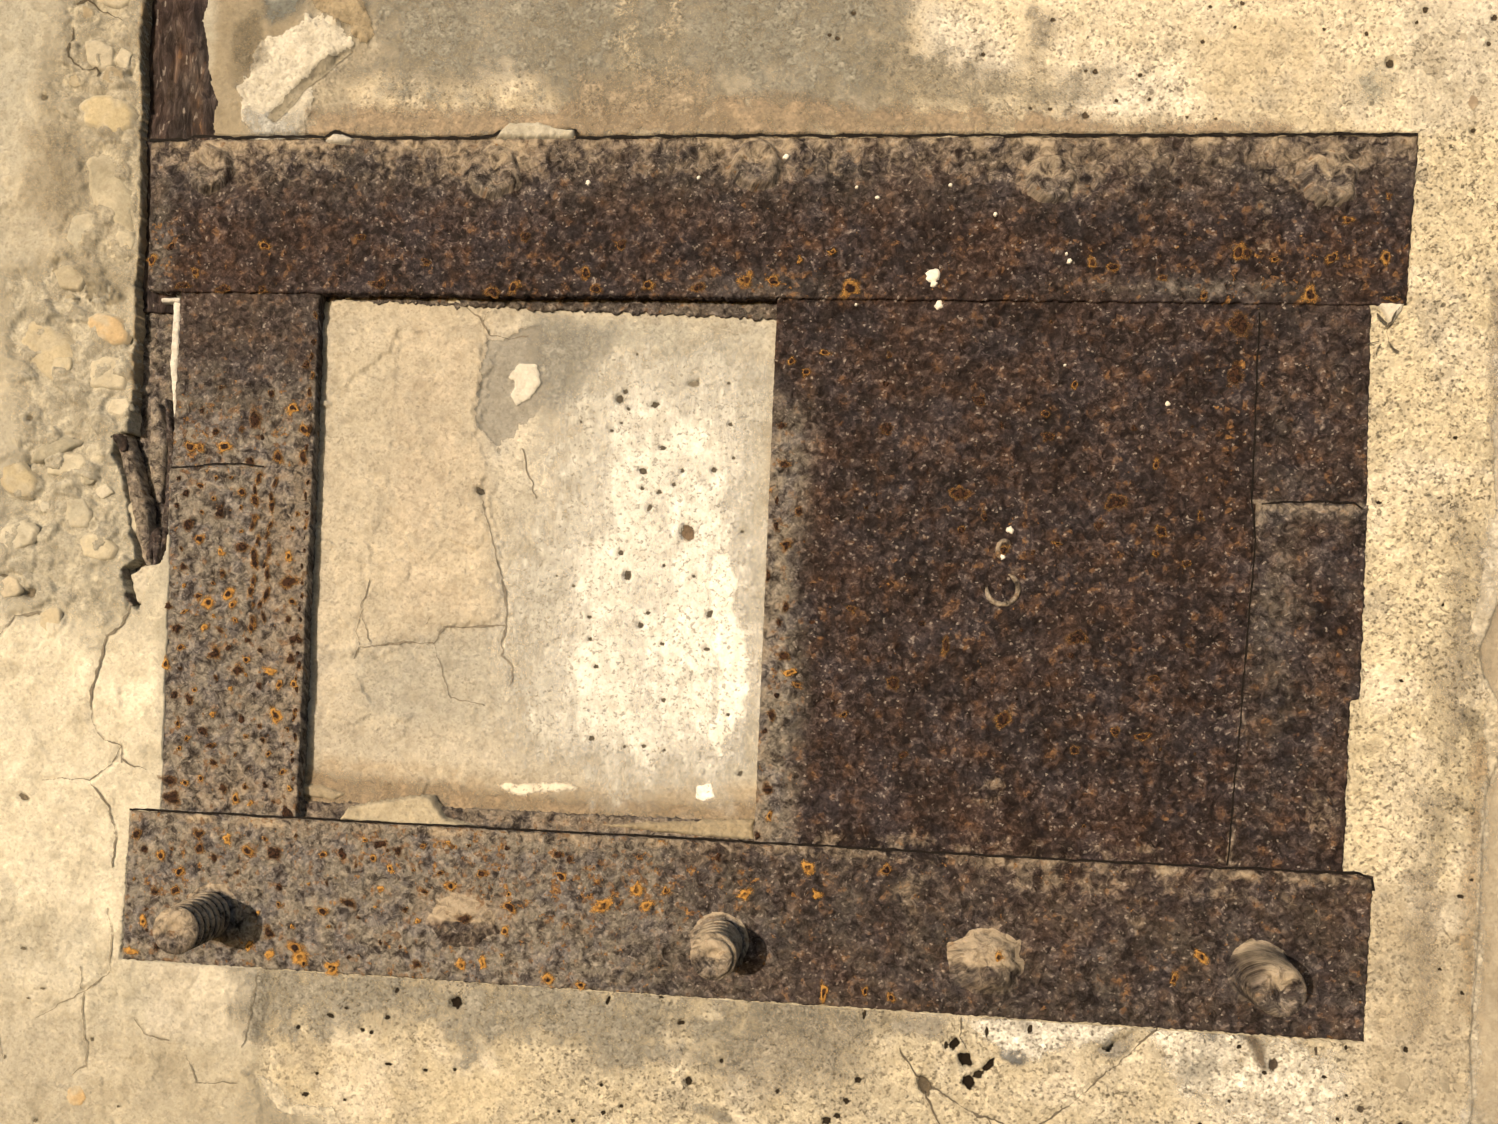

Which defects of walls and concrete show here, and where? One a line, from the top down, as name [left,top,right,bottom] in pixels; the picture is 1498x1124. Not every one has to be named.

crack [466,307,528,339]
corrosion [841,279,860,298]
corrosion [773,496,791,551]
crack [1,611,41,633]
corrosion [158,339,773,875]
crack [47,312,1375,891]
corrosion [762,651,802,734]
corrosion [123,829,185,955]
corrosion [245,883,351,976]
corrosion [316,837,415,928]
corrosion [802,861,822,899]
crack [38,908,112,1074]